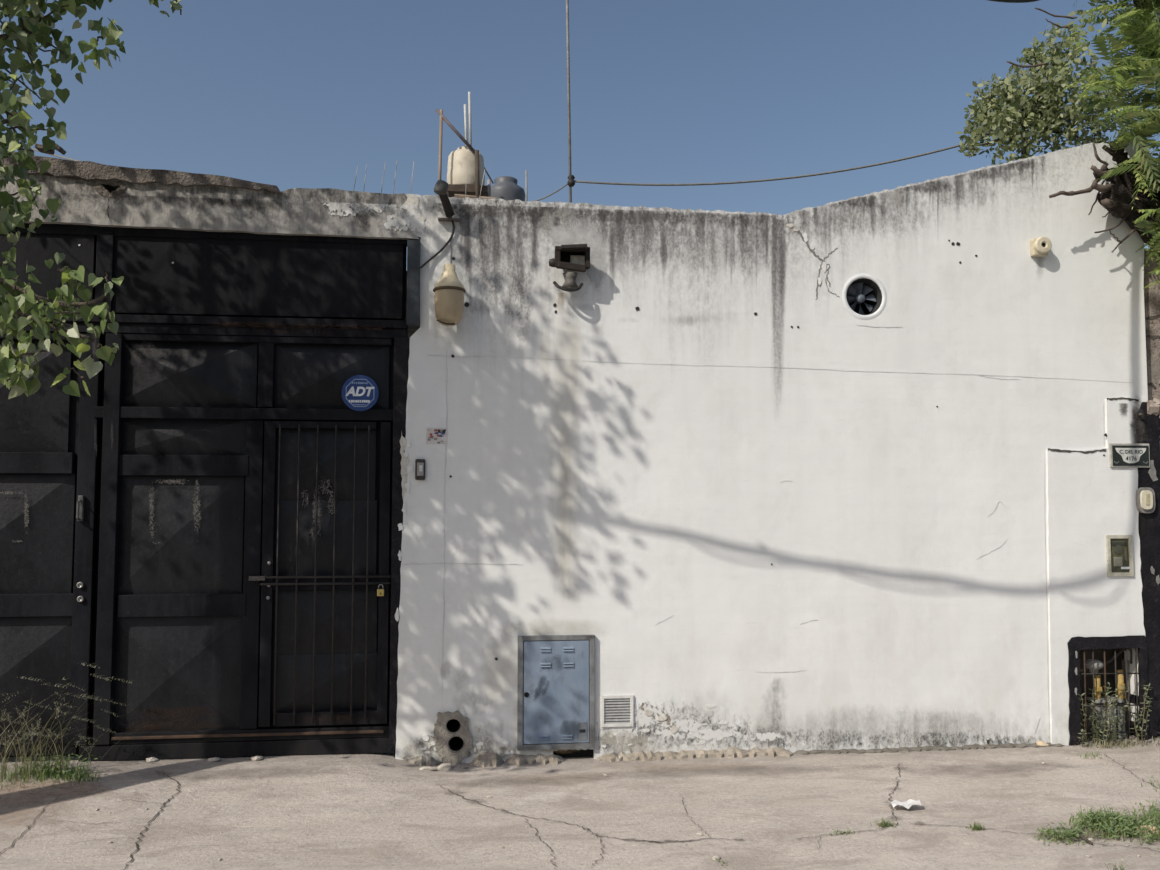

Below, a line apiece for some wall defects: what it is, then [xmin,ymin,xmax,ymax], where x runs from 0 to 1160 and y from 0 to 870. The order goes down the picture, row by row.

leakage [440,205,678,270]
leakage [697,212,784,297]
crack [786,215,840,300]